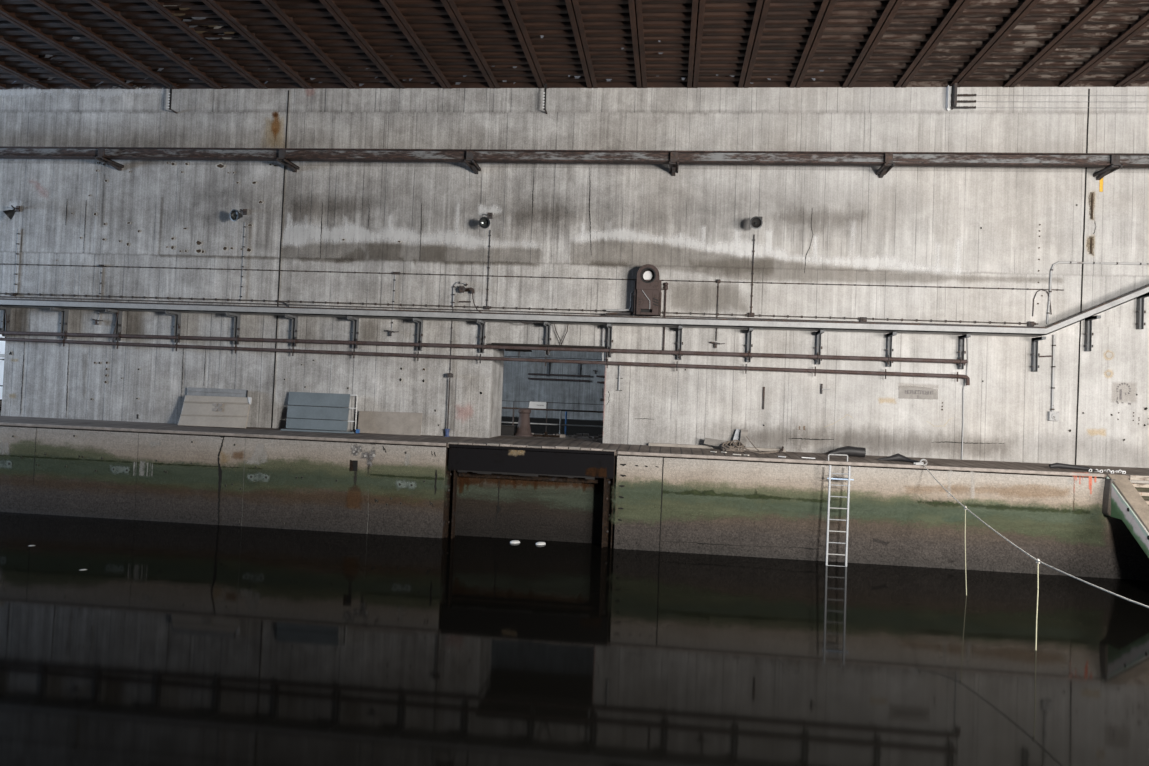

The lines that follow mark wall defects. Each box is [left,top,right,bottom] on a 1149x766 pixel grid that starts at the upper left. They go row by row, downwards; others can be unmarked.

rust [271,112,280,139]
crack [217,436,246,525]